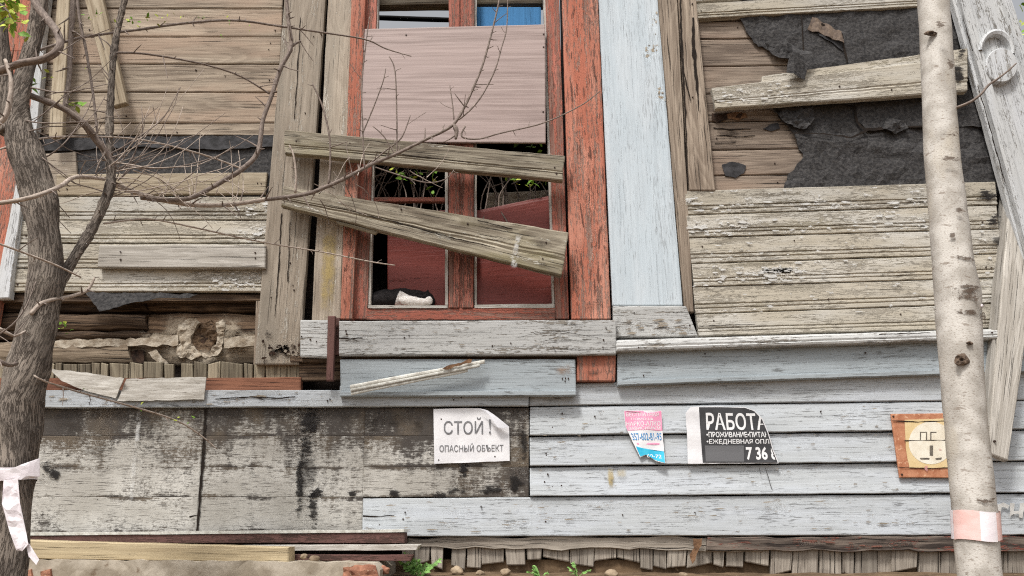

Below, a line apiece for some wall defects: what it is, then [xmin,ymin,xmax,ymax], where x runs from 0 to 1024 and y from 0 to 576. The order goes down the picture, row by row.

peeling [718,83,791,103]
peeling [685,185,928,287]
flaking render [147,318,248,363]
water stain [295,408,323,530]